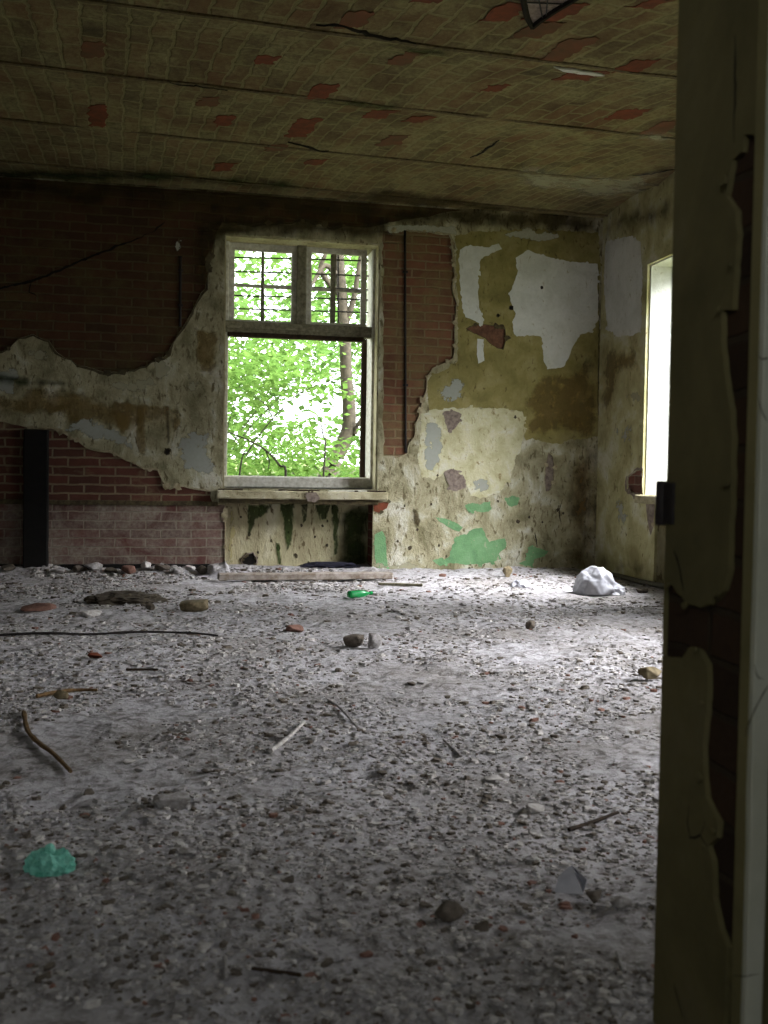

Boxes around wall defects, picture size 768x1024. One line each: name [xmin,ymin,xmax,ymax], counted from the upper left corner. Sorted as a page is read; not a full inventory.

crack [316,23,416,45]
flaking render [478,2,661,81]
crack [470,140,499,158]
crack [0,222,165,296]
spalling [0,177,643,515]
water stain [527,351,636,435]
spalling [0,420,242,565]
water stain [301,504,339,554]
peeling [430,503,507,569]
peeling [519,545,548,568]
spalling [665,135,755,944]